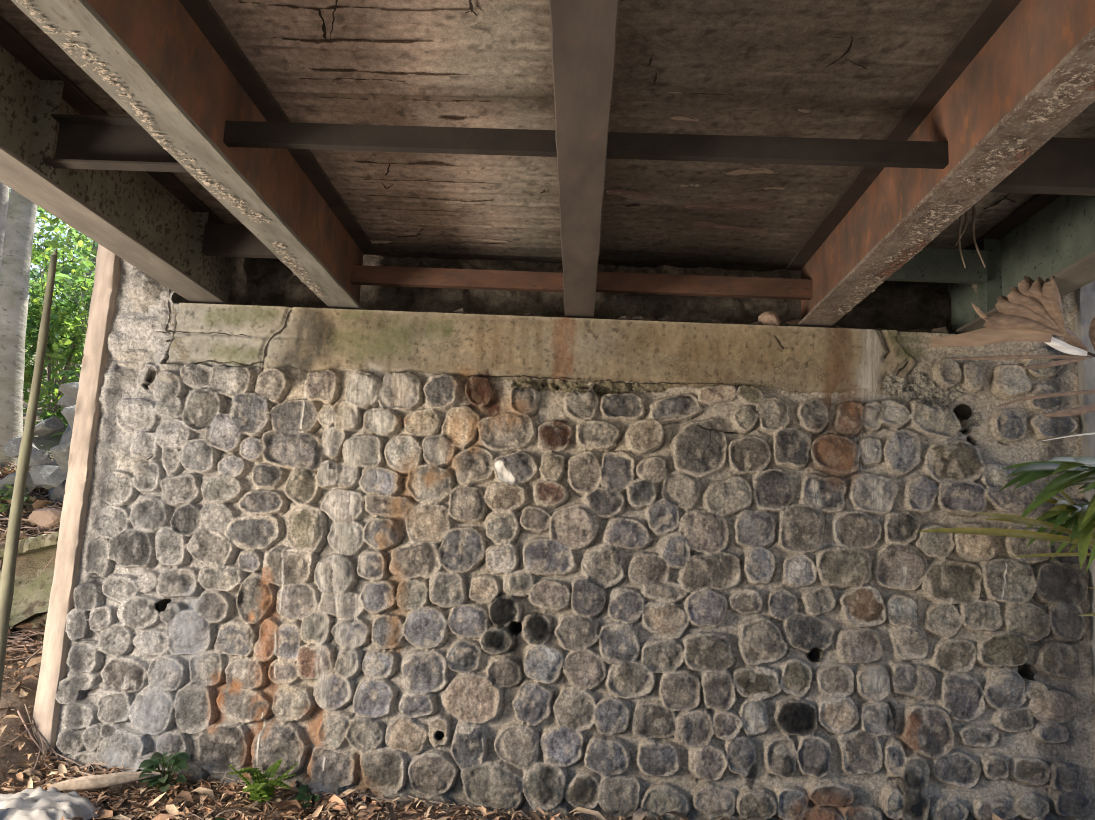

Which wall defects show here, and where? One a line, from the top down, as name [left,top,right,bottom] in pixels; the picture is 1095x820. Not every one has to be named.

crack [318,0,338,43]
crack [465,0,477,16]
crack [156,306,292,372]
rust [211,678,240,731]